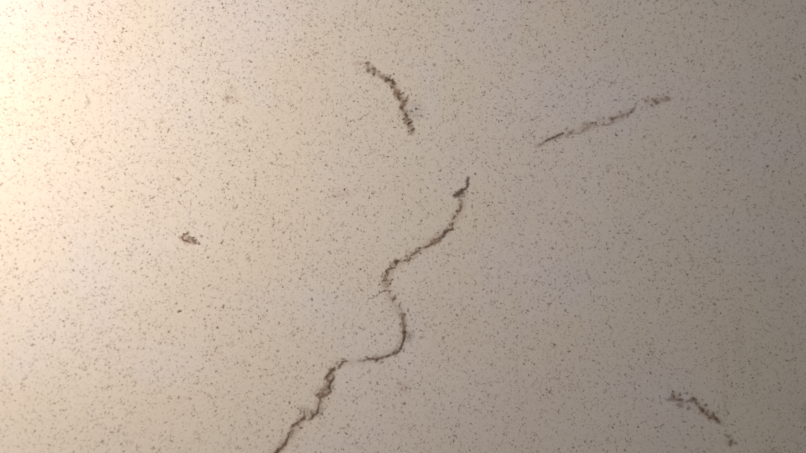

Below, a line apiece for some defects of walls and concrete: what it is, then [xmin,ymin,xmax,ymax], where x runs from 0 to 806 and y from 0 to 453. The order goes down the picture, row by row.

crack [373,73,417,132]
crack [366,178,468,361]
crack [275,361,347,453]